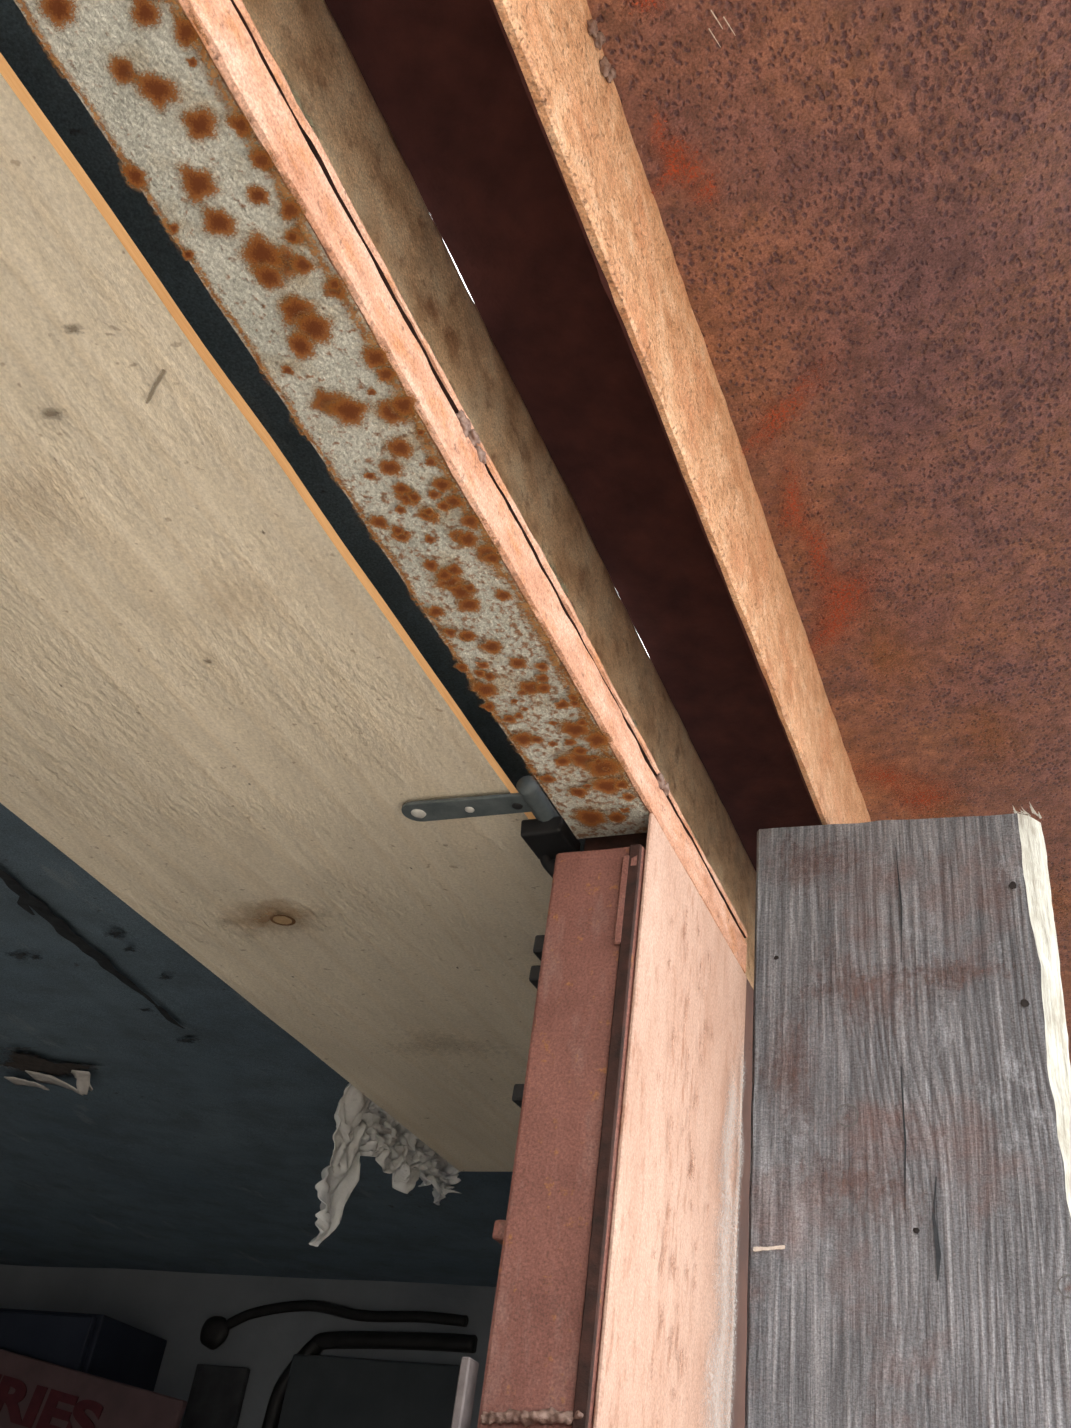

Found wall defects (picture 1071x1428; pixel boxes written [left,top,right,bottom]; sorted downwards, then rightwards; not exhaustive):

rust [16,0,649,830]
crack [894,847,902,962]
peeling [0,1051,95,1096]
crack [901,1067,941,1280]